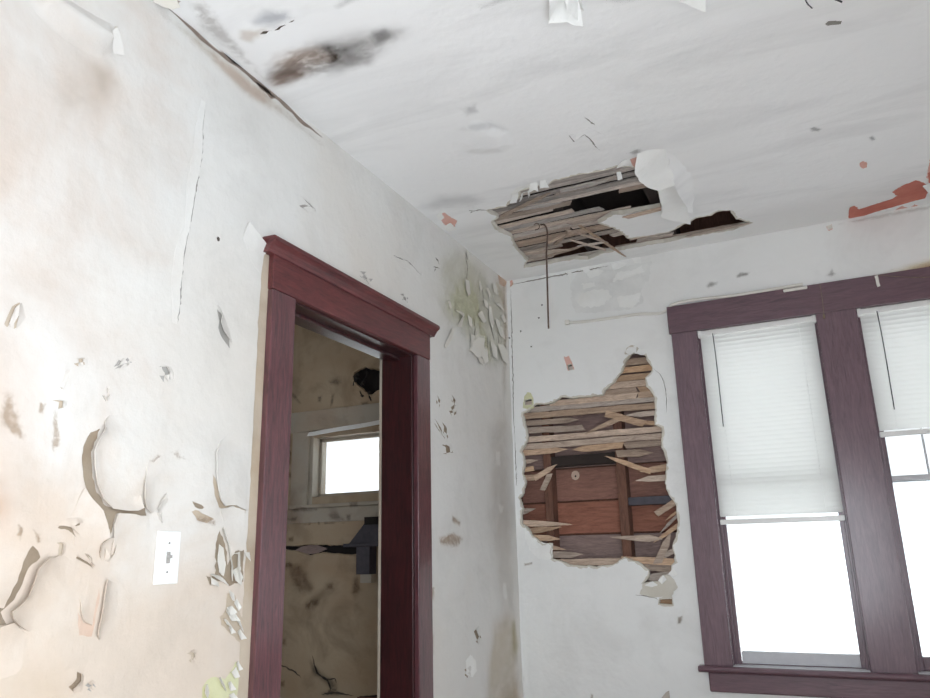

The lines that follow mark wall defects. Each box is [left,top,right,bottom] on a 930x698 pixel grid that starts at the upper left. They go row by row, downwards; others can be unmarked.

crack [169,9,321,137]
peeling [510,180,549,203]
peeling [848,160,930,218]
peeling [444,250,513,366]
flaking render [192,254,269,698]
spalling [518,345,680,607]
flaking render [0,414,171,696]